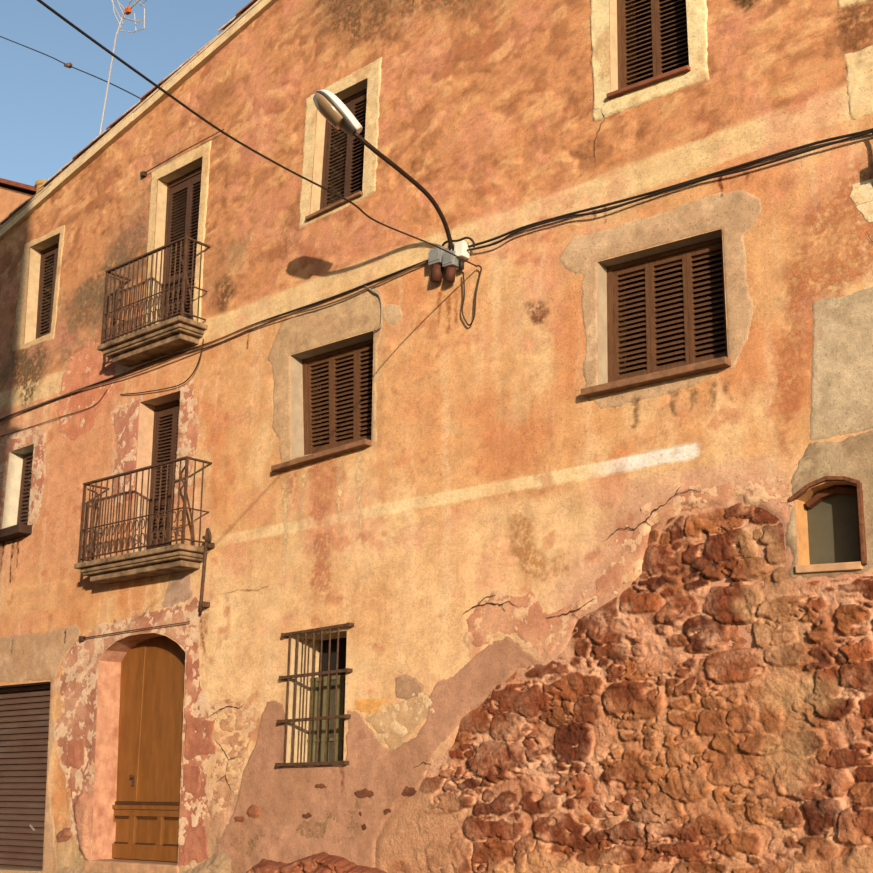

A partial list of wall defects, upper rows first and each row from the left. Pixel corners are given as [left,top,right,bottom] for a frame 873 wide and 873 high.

peeling [0,425,46,529]
water stain [13,345,46,405]
peeling [56,342,143,508]
peeling [174,379,201,506]
crack [605,487,700,541]
crack [463,595,518,614]
peeling [53,596,262,869]
peeling [352,692,434,751]
spalling [375,478,873,873]